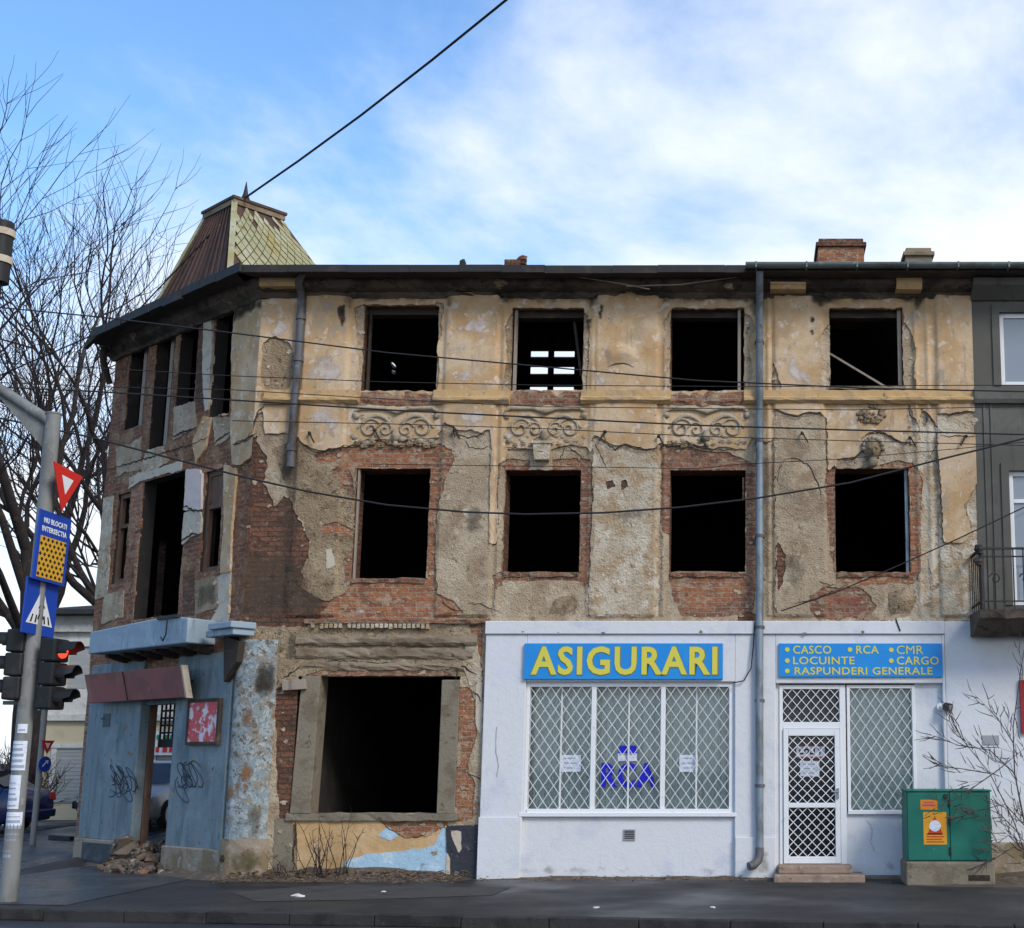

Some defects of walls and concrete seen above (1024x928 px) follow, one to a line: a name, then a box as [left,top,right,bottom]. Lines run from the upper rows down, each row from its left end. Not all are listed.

flaking render [195,325,208,431]
flaking render [130,479,143,617]
flaking render [241,405,980,874]